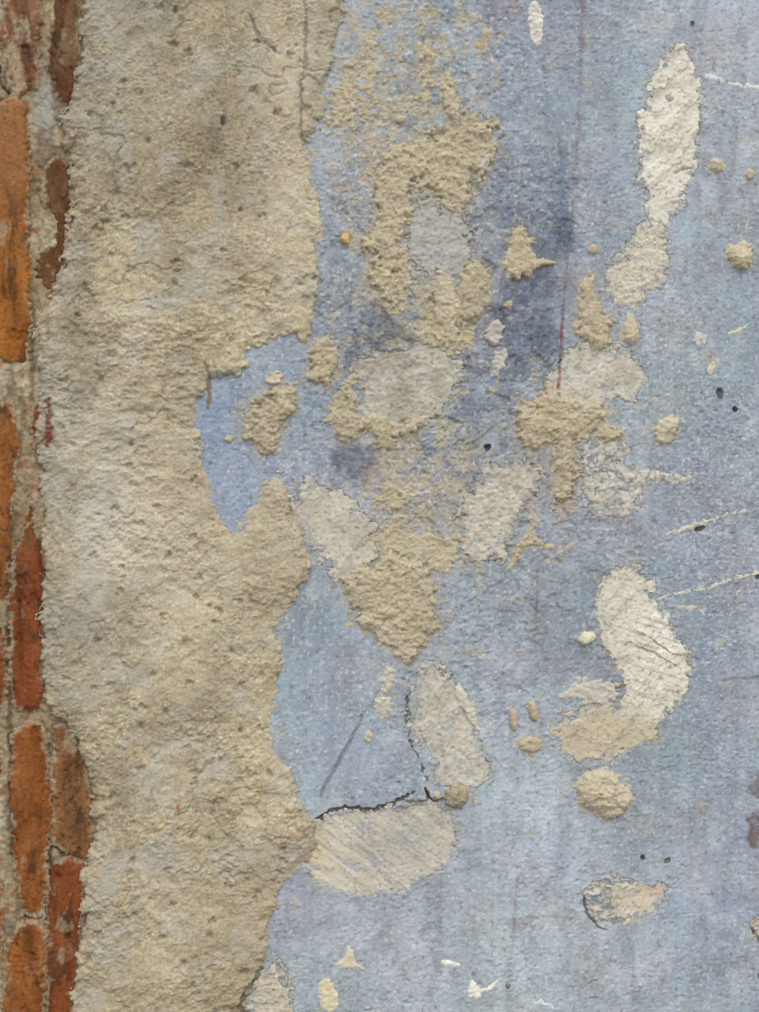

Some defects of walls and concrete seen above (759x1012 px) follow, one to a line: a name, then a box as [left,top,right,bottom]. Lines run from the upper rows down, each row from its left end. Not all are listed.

flaking render [0,0,478,1012]
crack [315,686,443,820]
peeling [405,656,491,791]